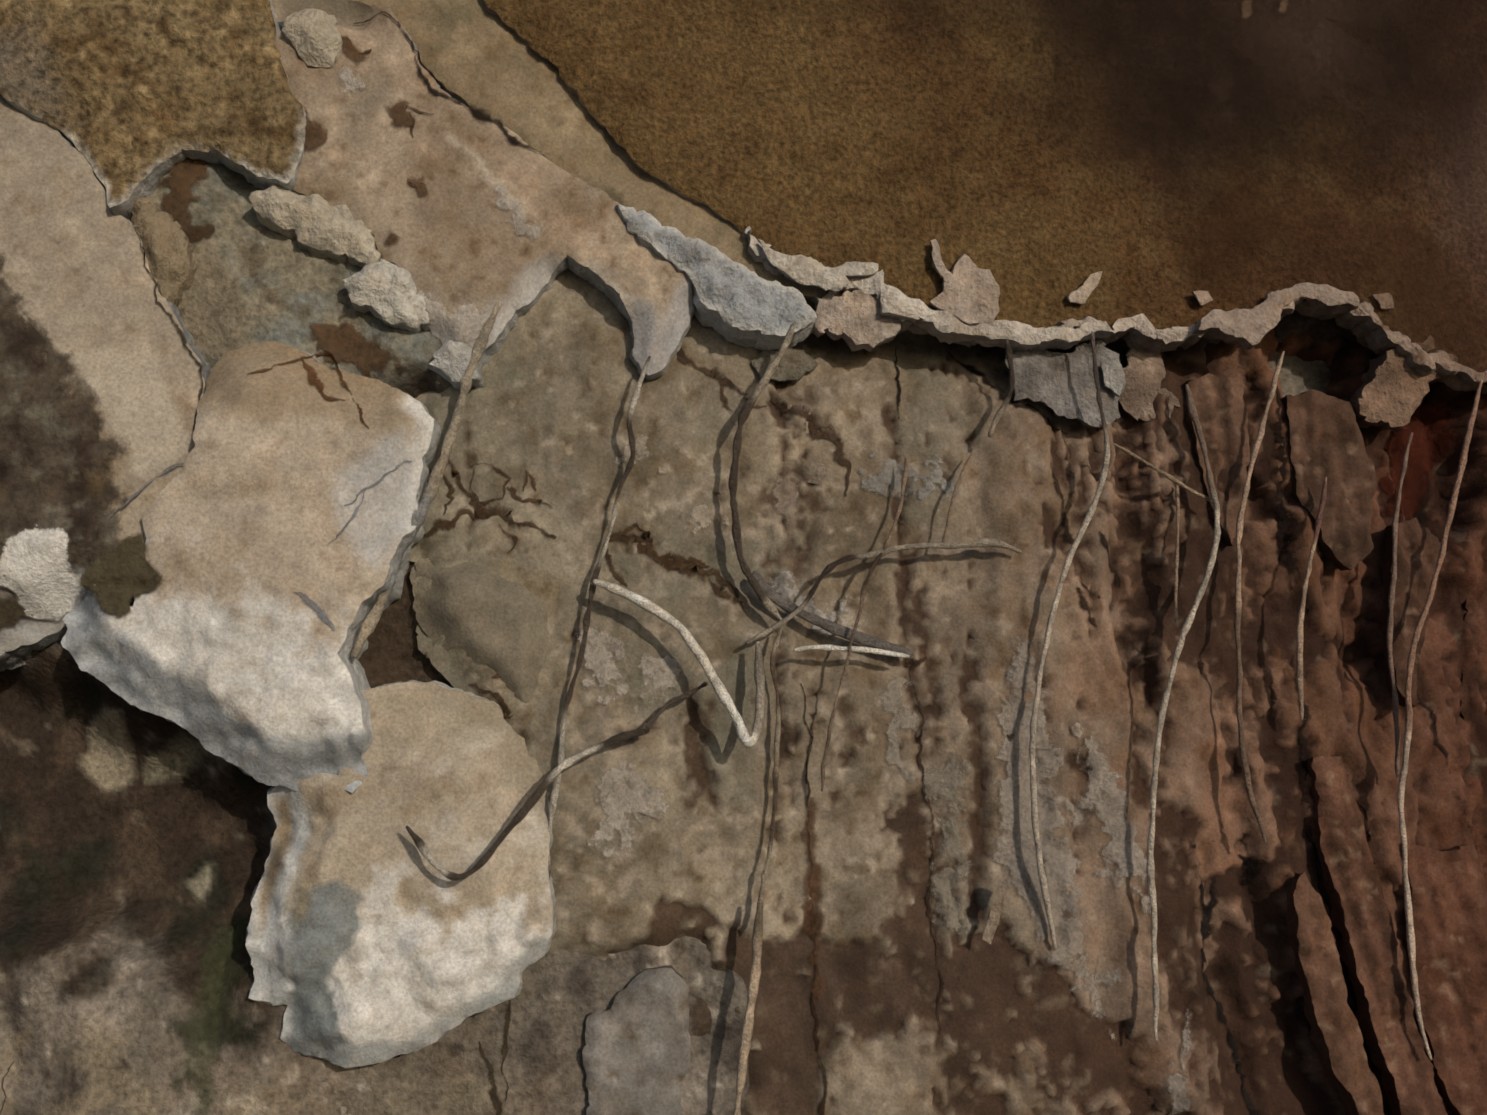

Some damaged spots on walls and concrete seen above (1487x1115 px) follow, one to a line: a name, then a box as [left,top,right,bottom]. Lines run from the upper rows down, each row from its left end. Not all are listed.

leakage [1045,0,1442,172]
leakage [0,254,128,621]
corrosion [678,348,852,496]
corrosion [1380,400,1460,521]
spalling [351,0,1487,1115]
spalling [0,626,67,672]
corrosion [802,801,826,999]
crack [479,1000,511,1115]